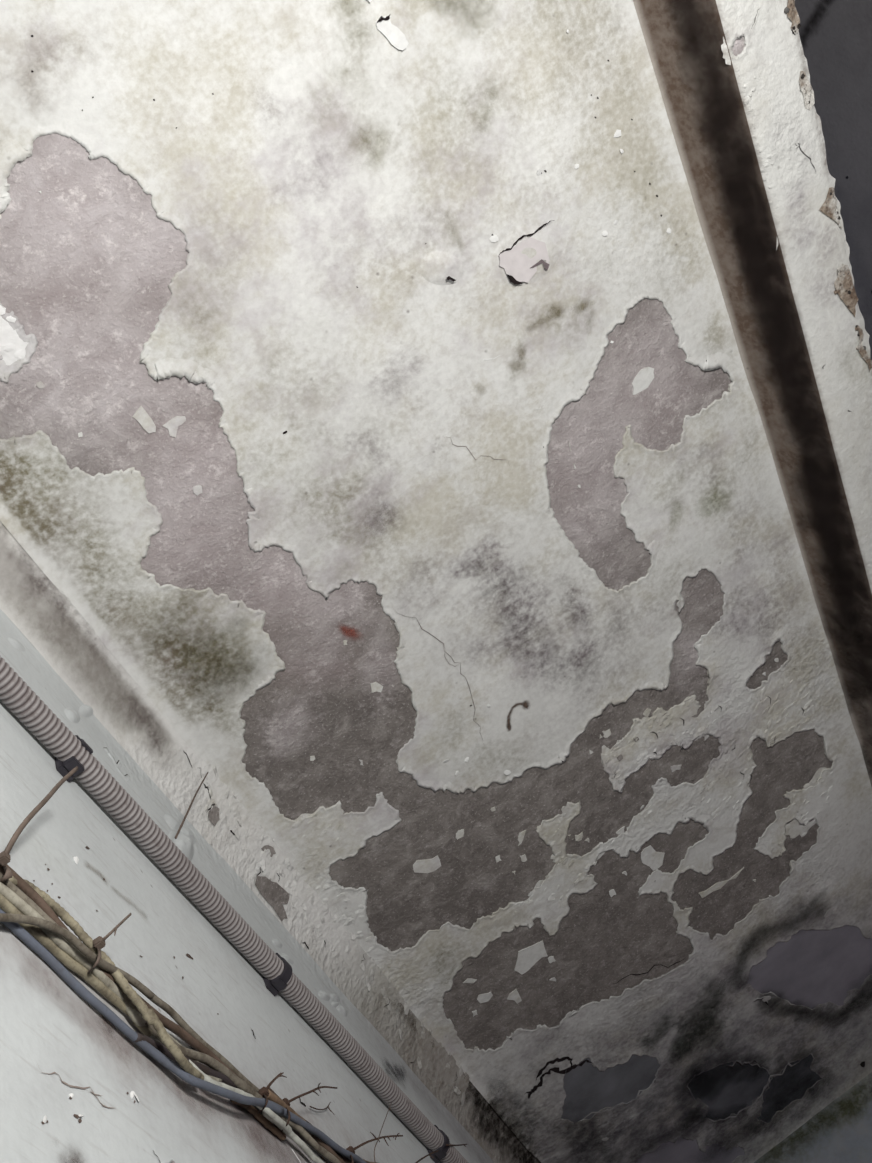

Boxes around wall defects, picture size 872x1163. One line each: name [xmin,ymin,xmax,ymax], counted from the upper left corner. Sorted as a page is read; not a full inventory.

spalling [784,0,801,34]
spalling [799,71,815,110]
peeling [721,23,791,250]
spalling [819,187,842,228]
peeling [0,124,743,1106]
peeling [438,629,838,1056]
peeling [744,909,872,1011]
leakage [674,990,721,1058]
leakage [763,991,872,1023]
crack [525,1057,592,1098]
leakage [474,1090,541,1163]